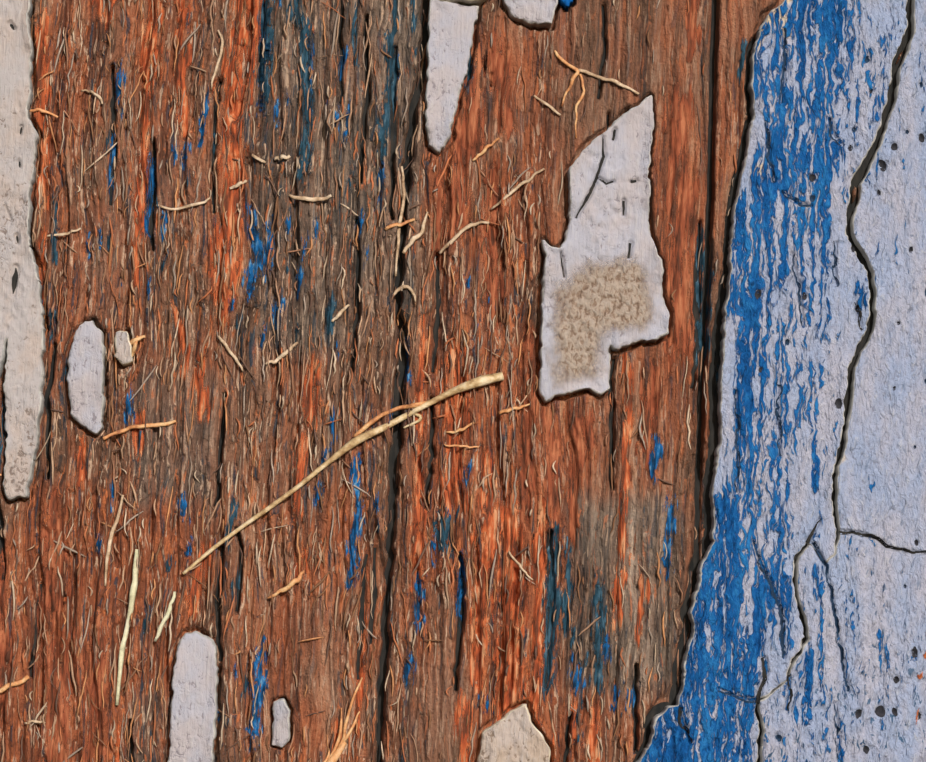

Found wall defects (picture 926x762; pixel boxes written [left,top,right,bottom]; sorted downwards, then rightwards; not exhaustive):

peeling [425,0,488,155]
peeling [502,0,573,29]
peeling [0,0,46,501]
peeling [538,95,670,403]
peeling [66,321,134,435]
crack [718,0,926,762]
peeling [167,631,219,762]
peeling [272,698,291,748]
peeling [477,704,551,762]